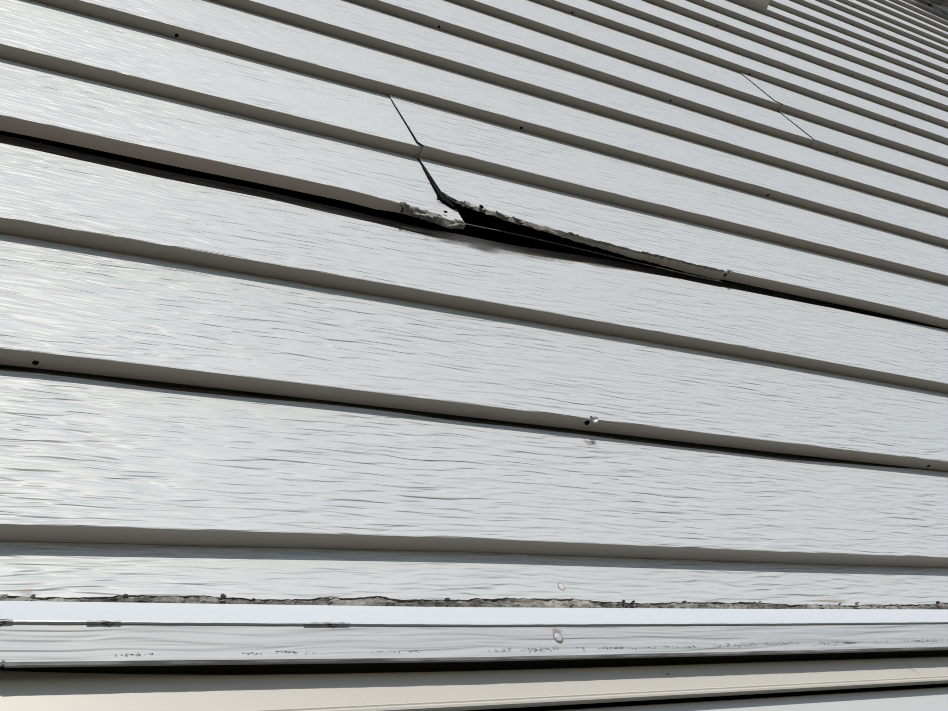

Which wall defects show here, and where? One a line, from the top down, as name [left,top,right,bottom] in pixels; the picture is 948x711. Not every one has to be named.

crack [390,98,456,210]
spalling [462,201,733,276]